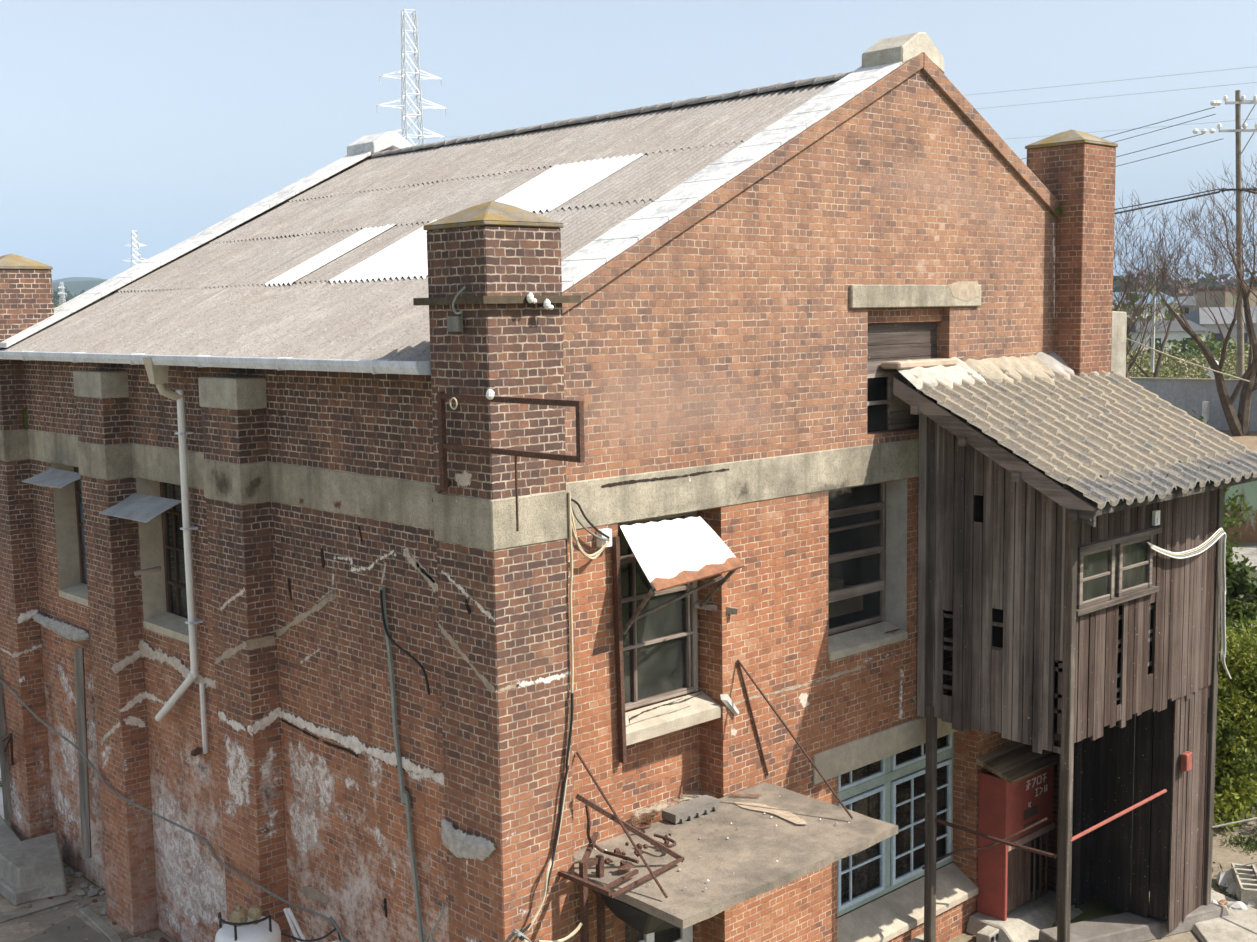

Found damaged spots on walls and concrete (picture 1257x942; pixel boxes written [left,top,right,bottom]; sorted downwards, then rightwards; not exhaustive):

efflorescence [58,667,94,704]
efflorescence [59,723,77,782]
efflorescence [90,720,111,768]
crack [281,719,406,771]
efflorescence [10,782,22,824]
efflorescence [39,756,78,825]
efflorescence [225,735,383,853]
efflorescence [128,791,227,942]
efflorescence [367,826,397,873]